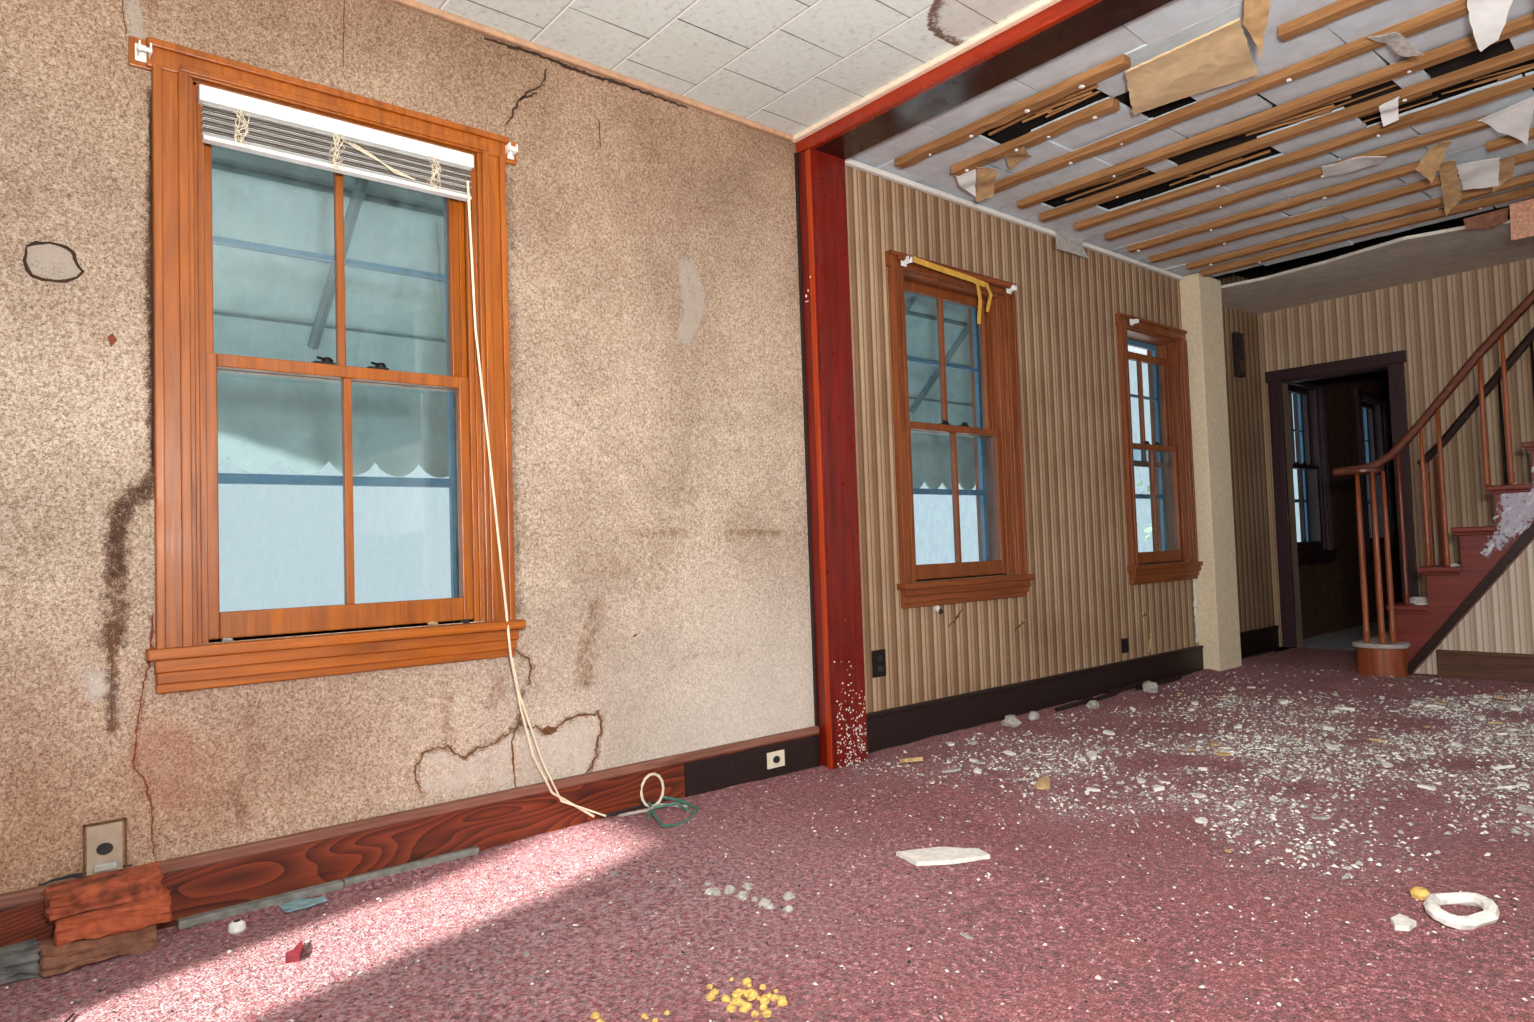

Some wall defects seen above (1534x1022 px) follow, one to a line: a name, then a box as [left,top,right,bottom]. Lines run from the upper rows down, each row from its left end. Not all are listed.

crack [484,37,687,125]
leakage [927,0,963,46]
peeling [23,241,85,283]
leakage [97,86,154,733]
crack [110,615,155,856]
crack [414,649,603,797]